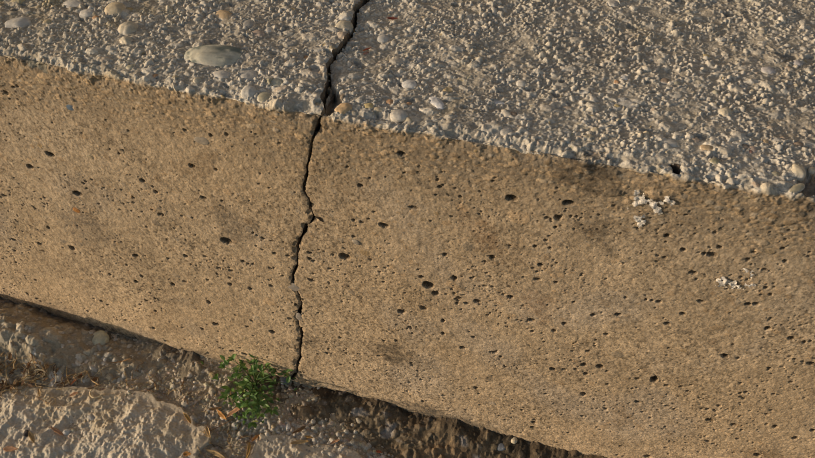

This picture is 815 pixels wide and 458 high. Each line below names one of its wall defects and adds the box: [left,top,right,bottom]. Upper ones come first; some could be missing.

crack [290,0,370,378]
peeling [627,190,676,228]